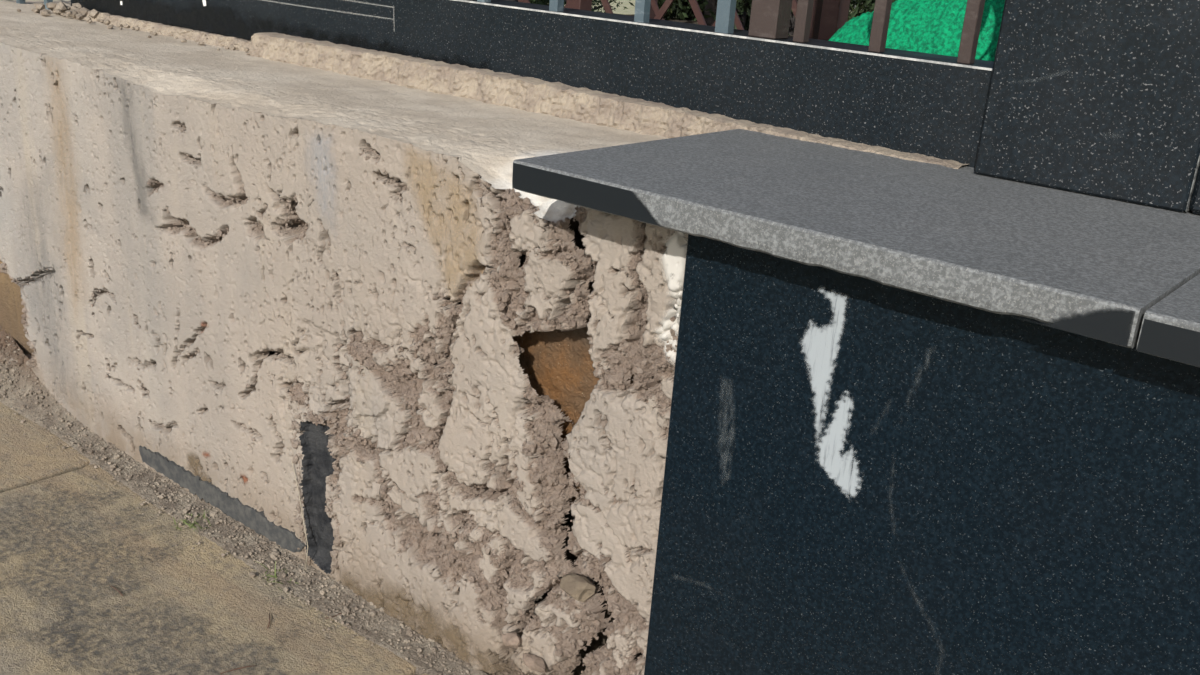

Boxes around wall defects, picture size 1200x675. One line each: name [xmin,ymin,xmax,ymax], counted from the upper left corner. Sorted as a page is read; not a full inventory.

hole [359,139,407,205]
peeling [0,259,56,370]
crack [631,220,661,395]
spalling [231,174,688,675]
crack [335,212,654,675]